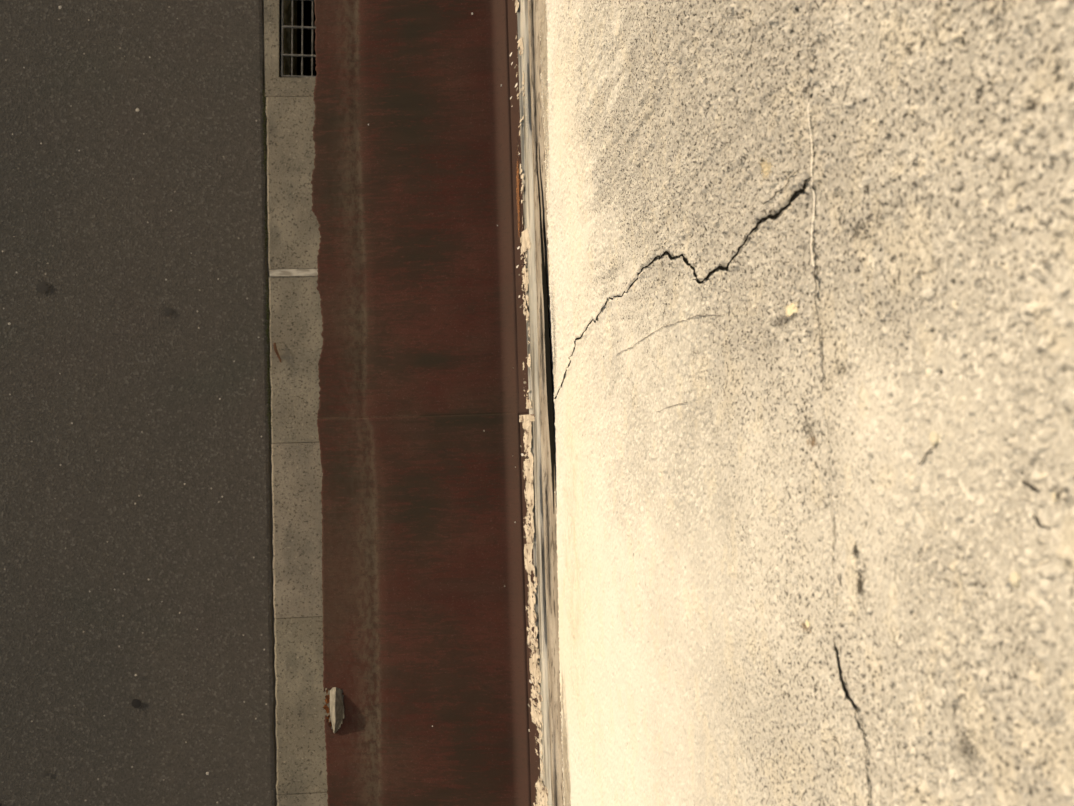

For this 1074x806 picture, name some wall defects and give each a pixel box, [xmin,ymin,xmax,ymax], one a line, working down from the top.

crack [536,0,870,806]